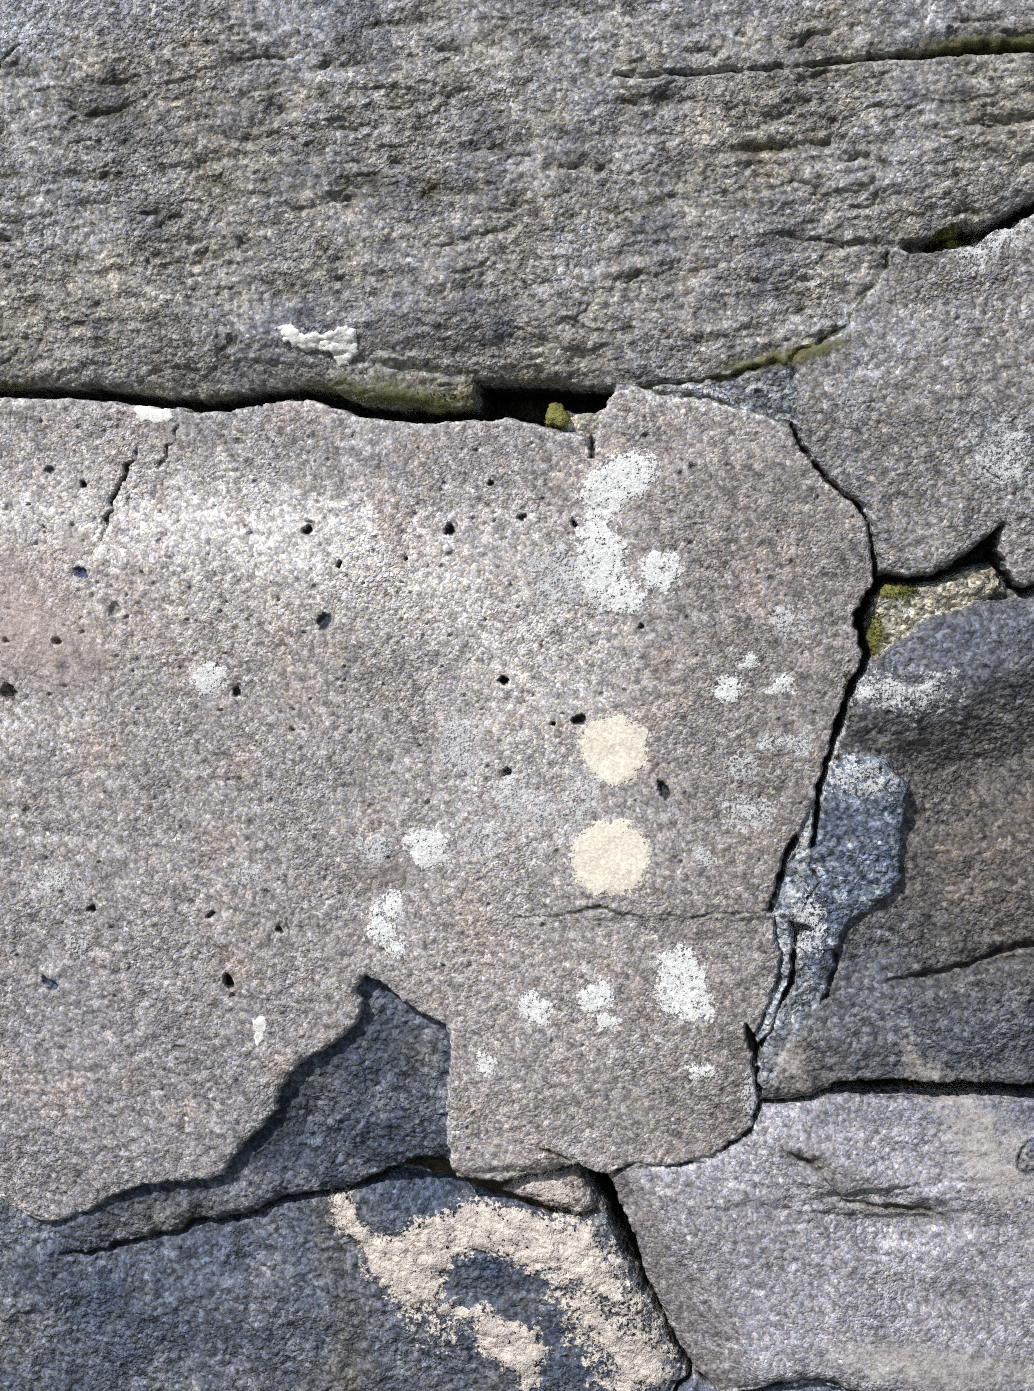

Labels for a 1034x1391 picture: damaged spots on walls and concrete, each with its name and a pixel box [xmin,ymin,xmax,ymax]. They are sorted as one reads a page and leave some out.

crack [616,35,1034,79]
crack [789,236,846,250]
crack [926,206,1034,253]
crack [62,253,1034,1391]